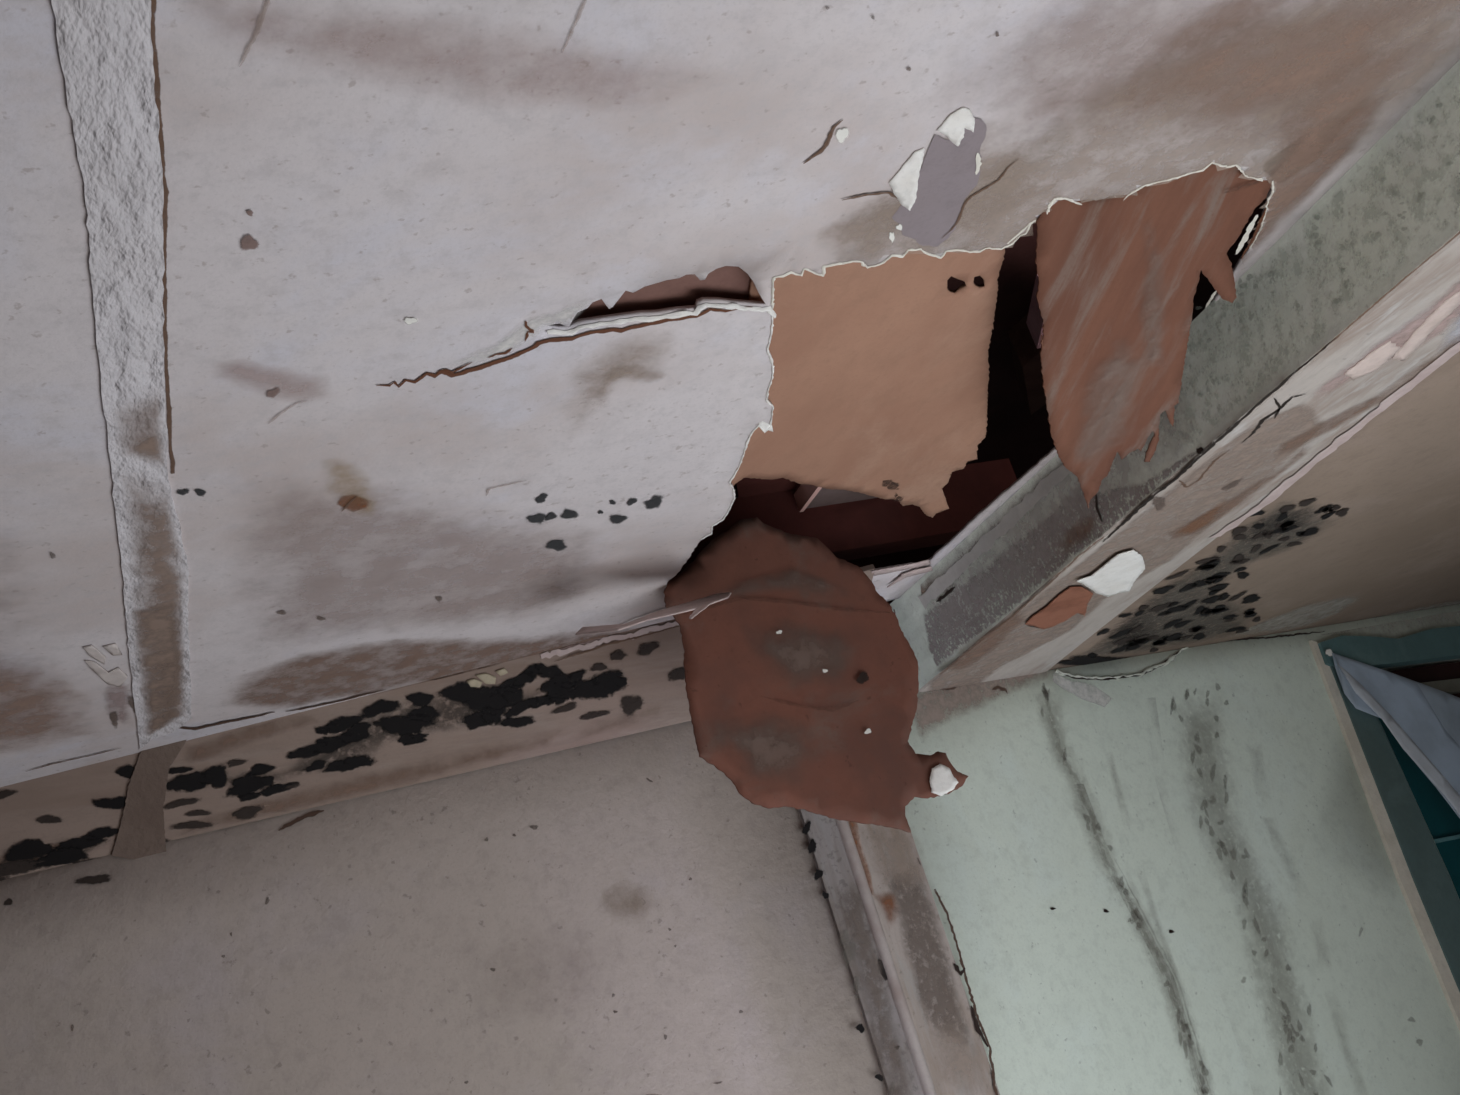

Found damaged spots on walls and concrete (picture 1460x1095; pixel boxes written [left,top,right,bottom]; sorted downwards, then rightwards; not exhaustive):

peeling [843,107,1018,247]
damp [845,0,1460,254]
crack [376,303,776,388]
peeling [1176,284,1460,538]
peeling [954,549,1145,669]
damp [915,406,1349,734]
damp [668,668,685,681]
damp [0,796,126,884]
damp [115,765,135,779]
damp [163,633,659,842]
peeling [929,764,959,796]